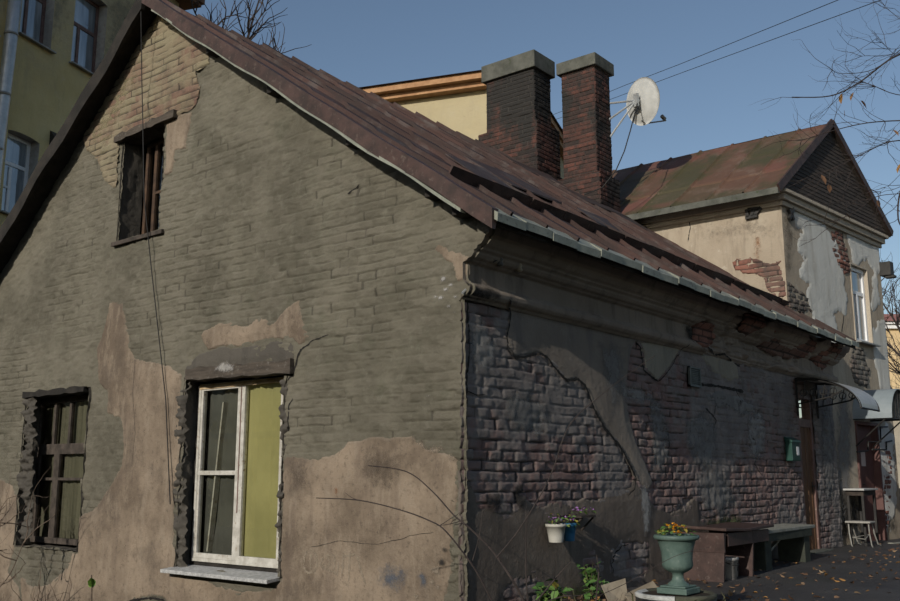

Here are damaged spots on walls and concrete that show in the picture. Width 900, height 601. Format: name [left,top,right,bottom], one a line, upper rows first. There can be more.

peeling [83,14,210,188]
peeling [732,212,891,390]
spalling [16,397,38,542]
crack [464,301,485,488]
crack [506,300,636,496]